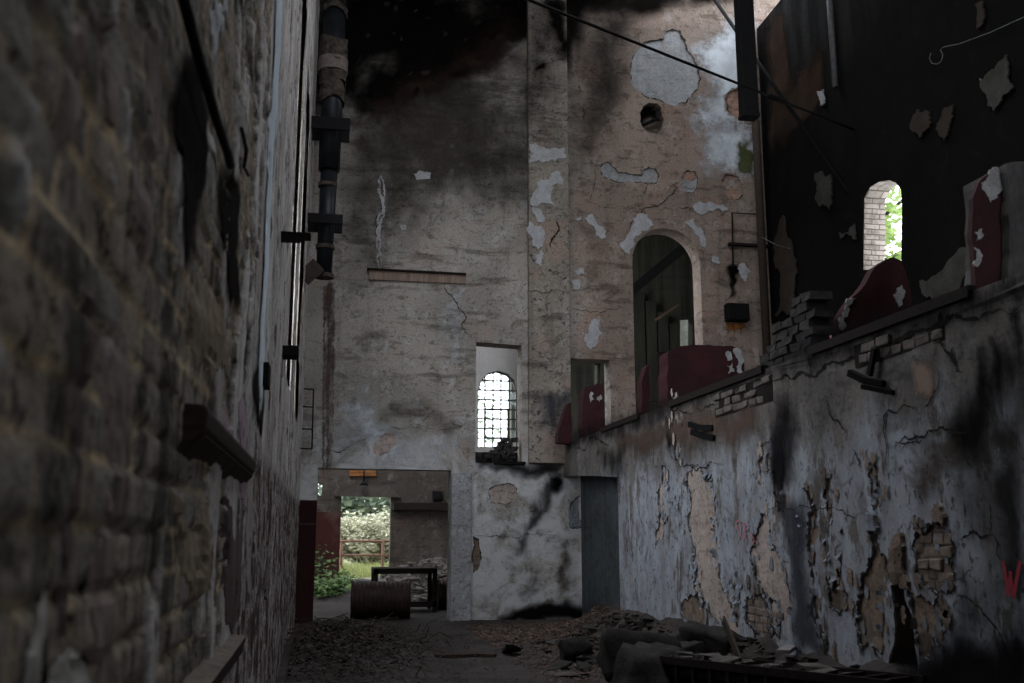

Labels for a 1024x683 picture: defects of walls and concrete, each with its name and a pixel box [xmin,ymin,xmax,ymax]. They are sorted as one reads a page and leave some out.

flaking render [630,28,701,106]
flaking render [600,162,659,184]
peeling [981,167,1003,203]
crack [374,175,385,268]
peeling [972,229,984,267]
crack [771,304,1022,472]
flaking render [488,483,517,504]
peeling [655,389,956,661]
flaking render [471,536,482,573]
water stain [556,543,570,590]